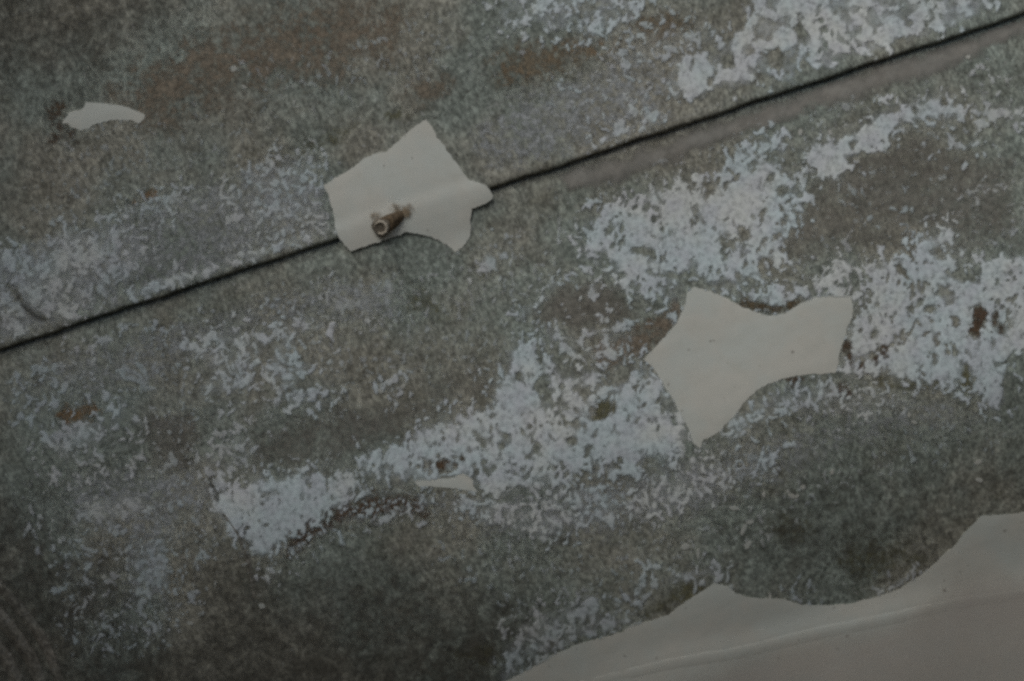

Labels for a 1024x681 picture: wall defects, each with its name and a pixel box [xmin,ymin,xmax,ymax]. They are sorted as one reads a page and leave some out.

peeling [482,0,1001,154]
peeling [966,55,1011,96]
peeling [0,86,1024,585]
rust [968,306,1003,338]
peeling [51,527,215,653]
peeling [493,512,1024,681]